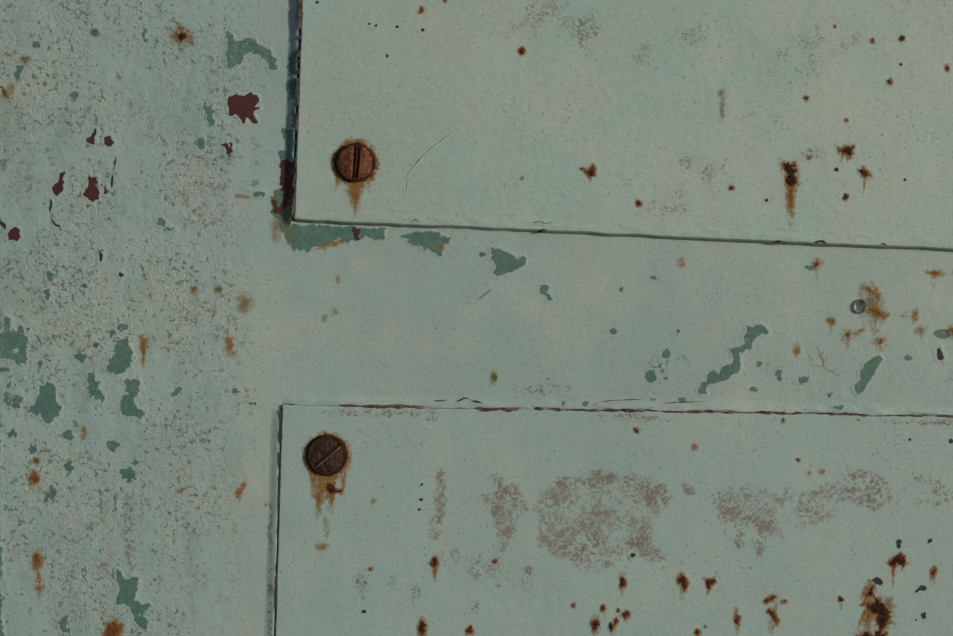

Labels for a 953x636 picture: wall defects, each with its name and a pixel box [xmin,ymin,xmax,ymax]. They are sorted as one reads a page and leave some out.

peeling [194,88,263,160]
peeling [222,27,453,259]
rust [331,139,380,213]
rust [781,162,799,217]
peeling [479,244,528,281]
rust [862,287,890,345]
peeling [0,313,65,438]
peeling [678,321,772,402]
peeling [851,352,885,398]
rust [305,431,351,512]
rust [887,553,908,583]
rust [855,580,894,636]